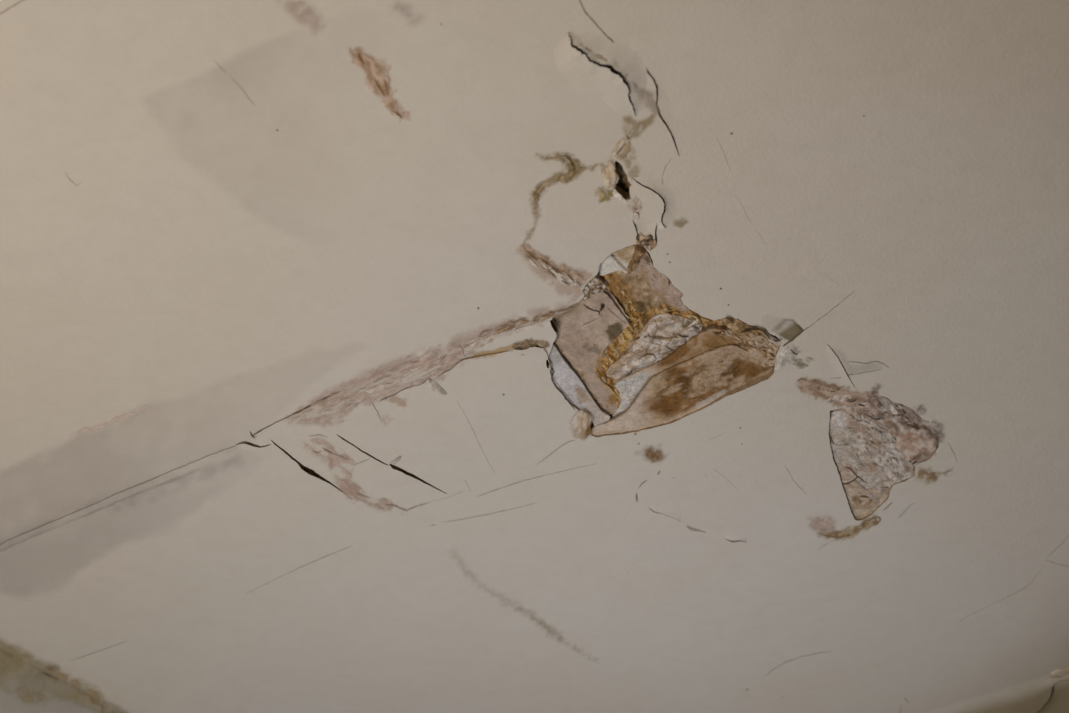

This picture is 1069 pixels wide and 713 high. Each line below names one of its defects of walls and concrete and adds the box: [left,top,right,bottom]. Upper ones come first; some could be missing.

peeling [350,48,409,119]
crack [554,0,688,156]
leakage [523,154,603,245]
flaking render [253,244,803,439]
crack [9,463,190,540]
crack [215,432,352,504]
crack [383,456,446,500]
flaking render [798,378,939,519]
leakage [0,645,118,713]
crack [1004,665,1069,713]